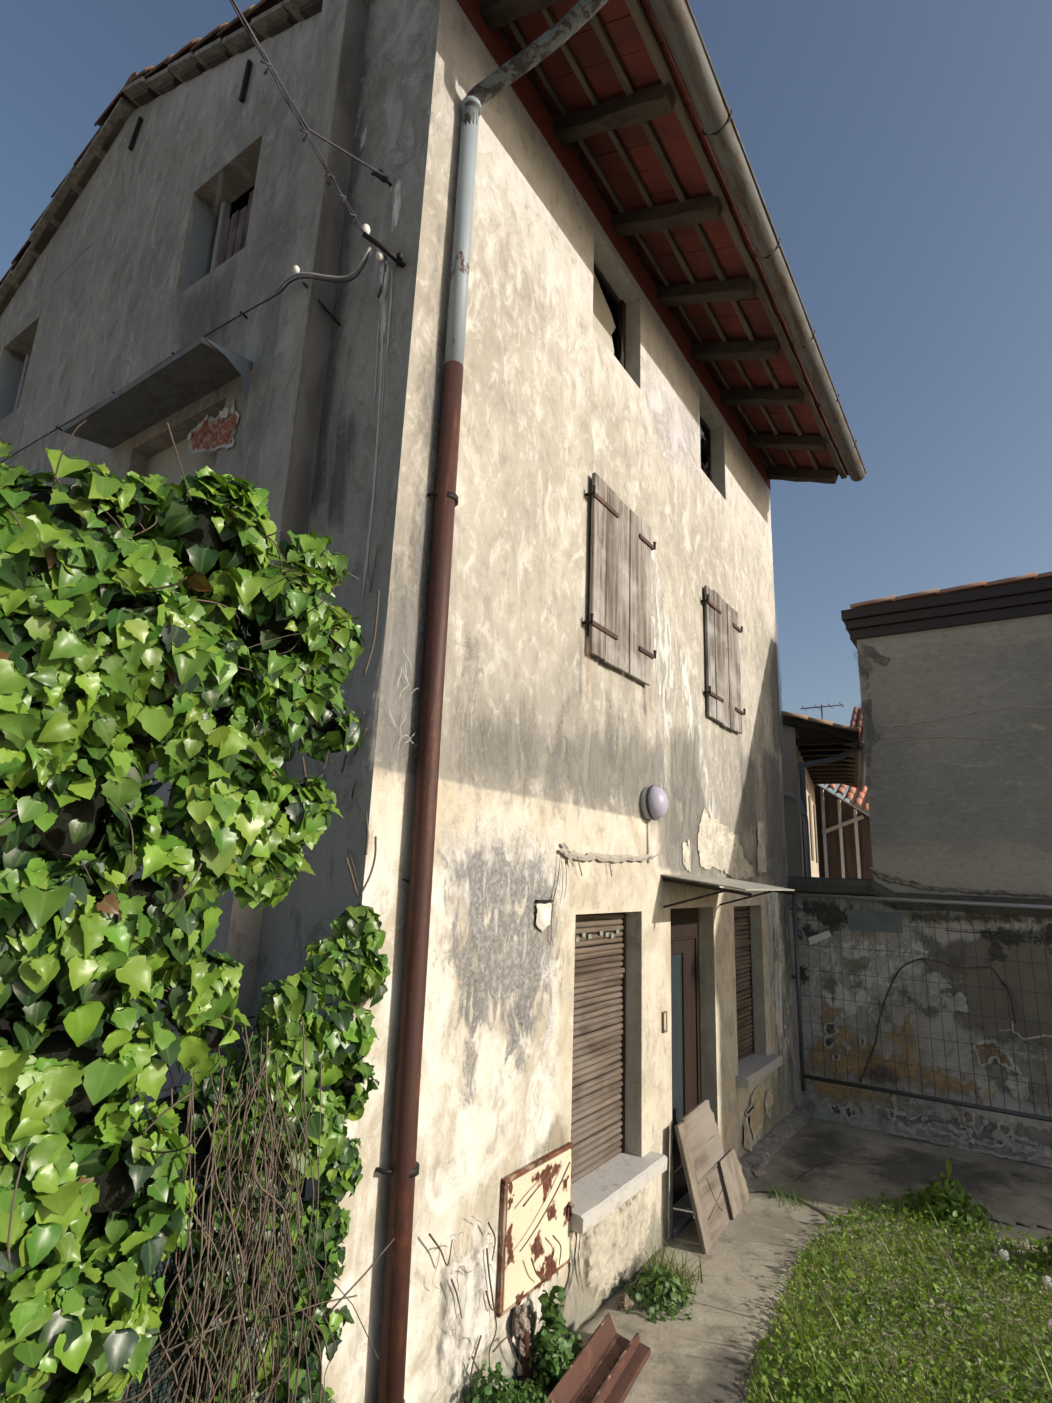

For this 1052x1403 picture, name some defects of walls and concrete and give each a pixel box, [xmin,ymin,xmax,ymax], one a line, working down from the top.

spalling [187,399,239,454]
water stain [444,817,564,1104]
peeling [924,972,970,1015]
peeling [744,1085,773,1152]
peeling [885,1039,1052,1162]